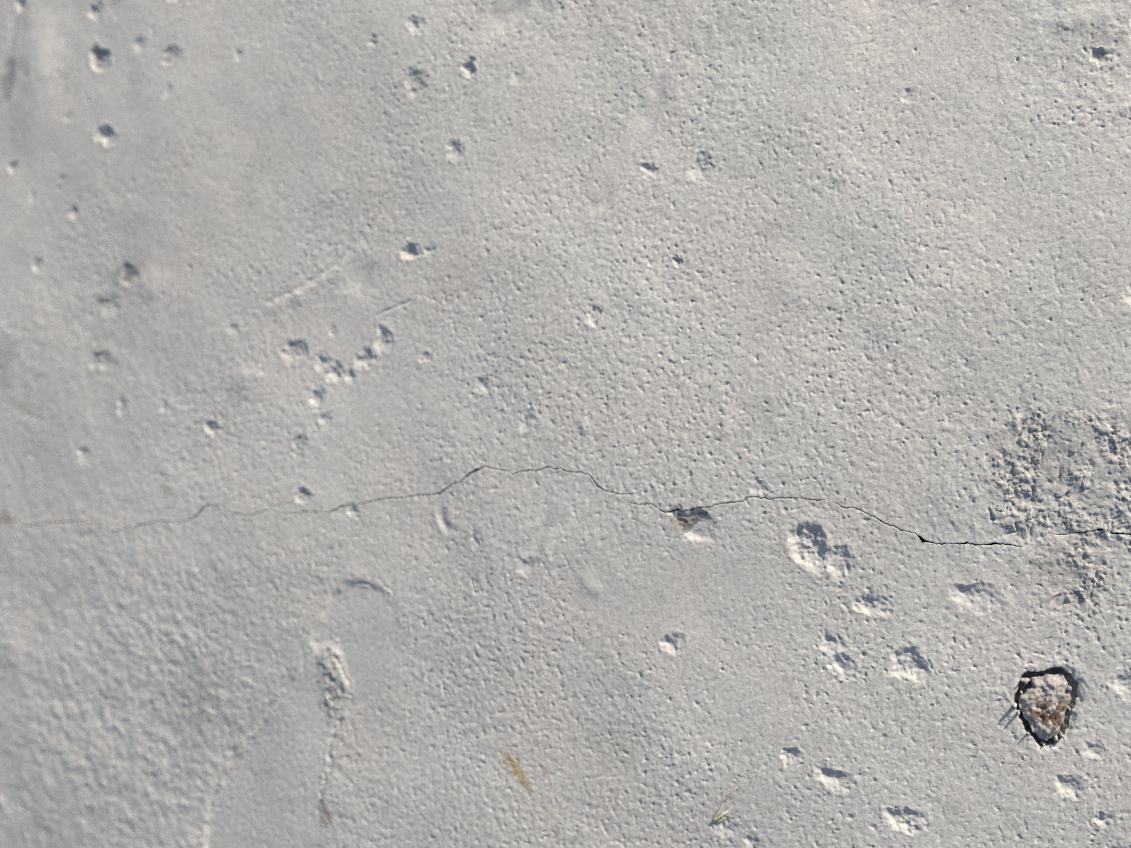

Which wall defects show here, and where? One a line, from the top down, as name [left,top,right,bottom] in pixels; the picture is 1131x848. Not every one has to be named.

crack [12,463,1131,551]
corrosion [1031,700,1066,734]